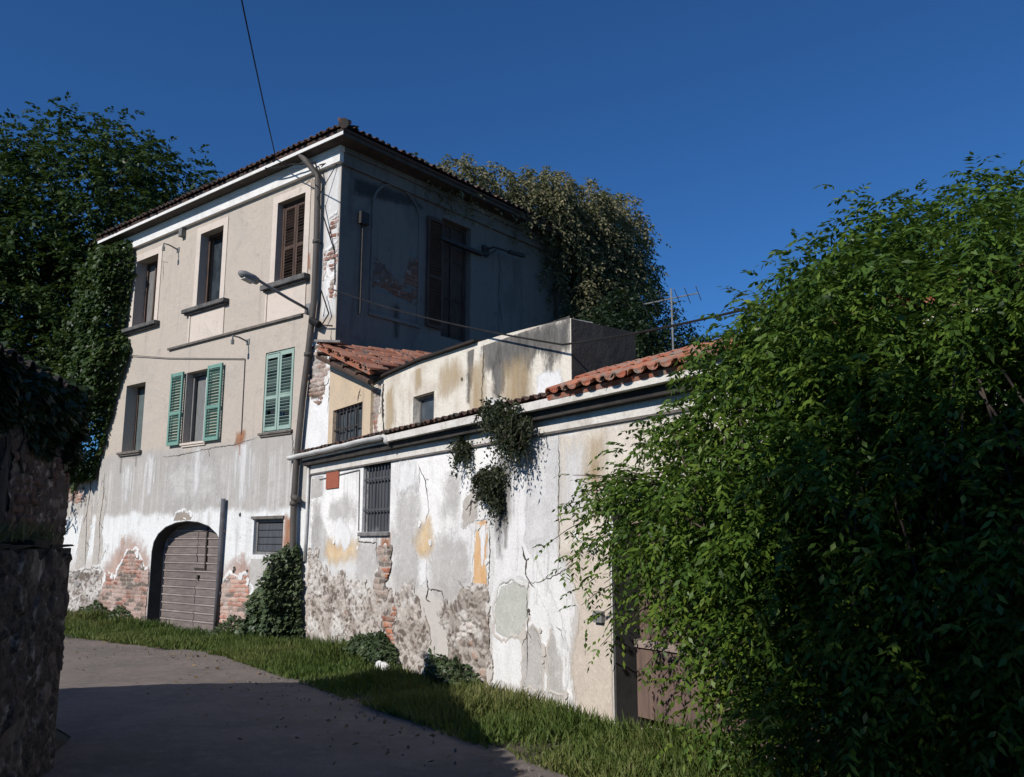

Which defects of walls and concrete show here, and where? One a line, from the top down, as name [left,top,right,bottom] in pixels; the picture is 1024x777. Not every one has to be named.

peeling [299,167,341,319]
water stain [440,316,570,408]
water stain [120,454,156,500]
water stain [165,446,221,510]
water stain [234,442,251,502]
flaking render [0,422,149,777]
flaking render [219,559,271,631]
flaking render [304,474,613,724]
crack [522,435,572,677]